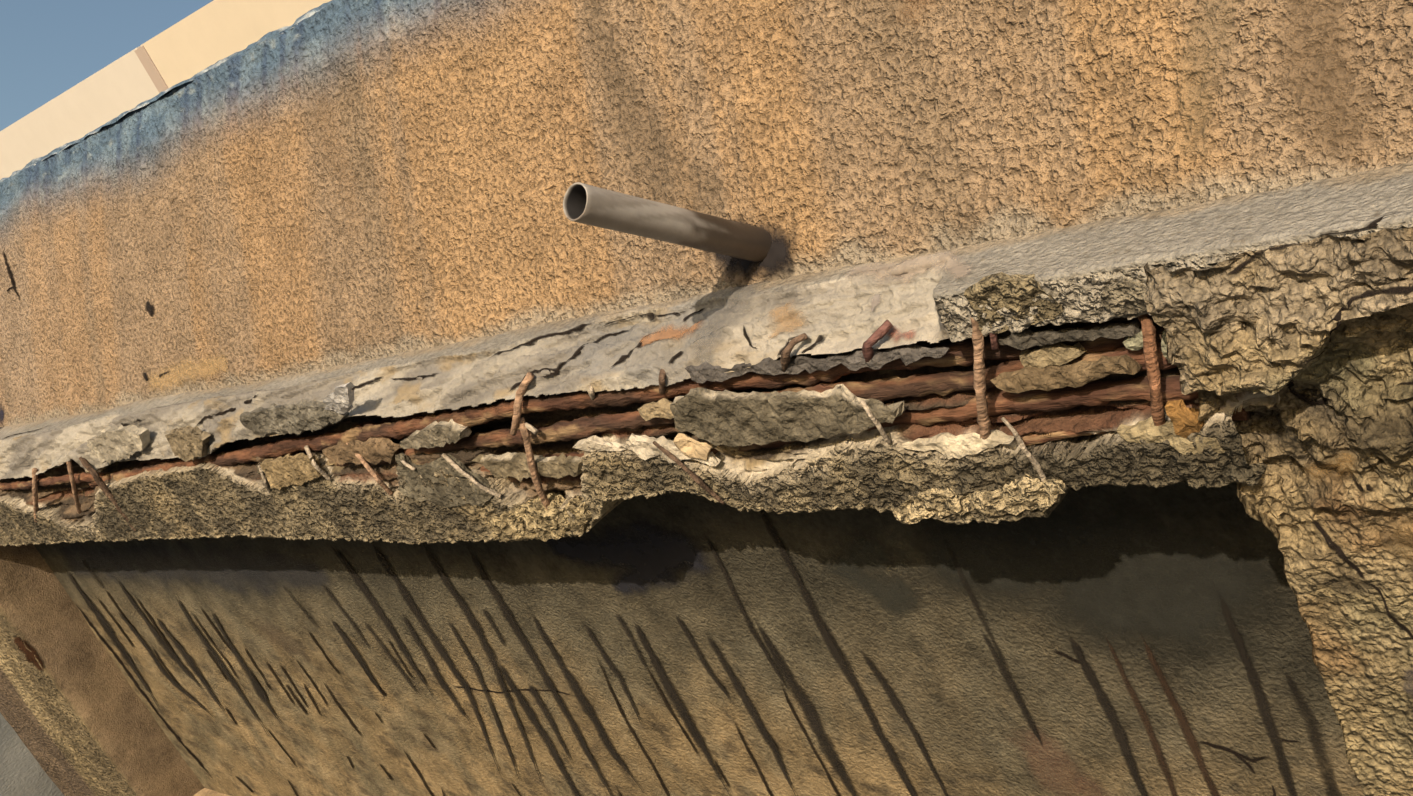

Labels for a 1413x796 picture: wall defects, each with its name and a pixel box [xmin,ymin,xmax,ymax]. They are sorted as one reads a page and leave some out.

crack [3,252,19,299]
spalling [0,227,1413,589]
crack [1347,470,1373,492]
crack [1314,521,1413,639]
spalling [14,637,43,671]
crack [77,591,445,796]
crack [454,686,570,695]
crack [598,661,669,796]
leakage [547,521,857,796]
crack [648,670,773,796]
crack [781,684,841,796]
crack [1201,739,1299,796]